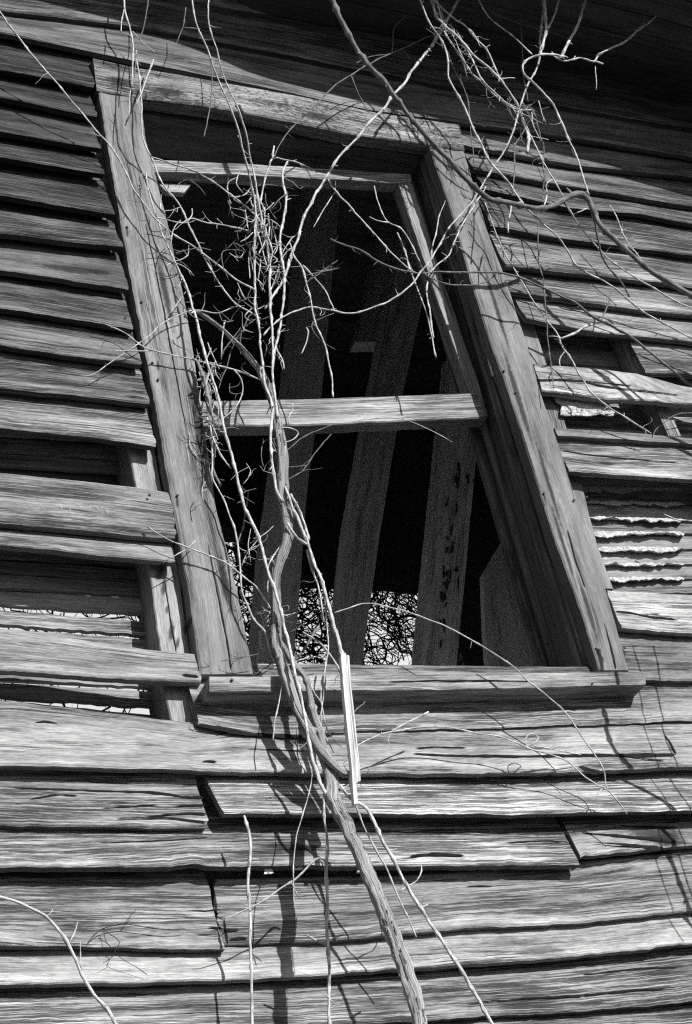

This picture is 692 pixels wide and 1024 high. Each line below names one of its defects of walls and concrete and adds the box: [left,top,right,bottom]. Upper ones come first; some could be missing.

crack [413,734,677,783]